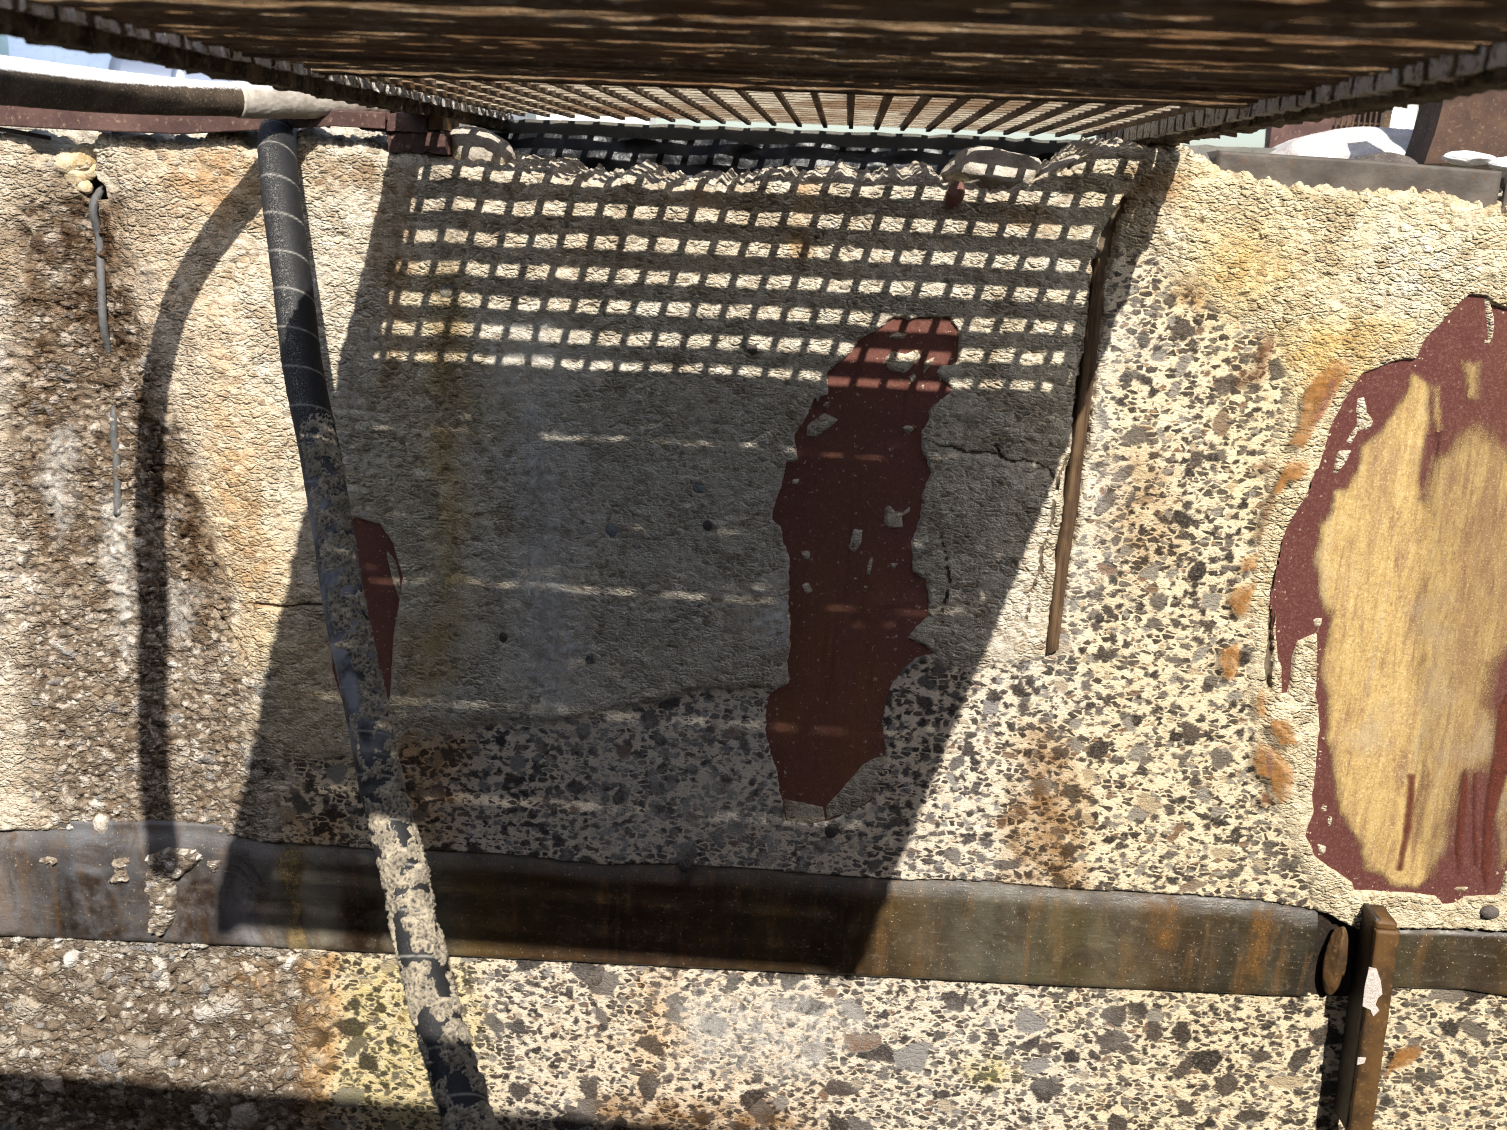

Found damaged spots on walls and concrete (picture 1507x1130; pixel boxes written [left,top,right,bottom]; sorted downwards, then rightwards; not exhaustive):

crack [1090,196,1128,286]
crack [925,358,1089,623]
corrosion [1254,360,1348,537]
peeling [353,518,403,700]
peeling [469,316,959,870]
corrosion [1222,643,1239,678]
corrosion [1230,556,1255,614]
peeling [1269,295,1507,919]